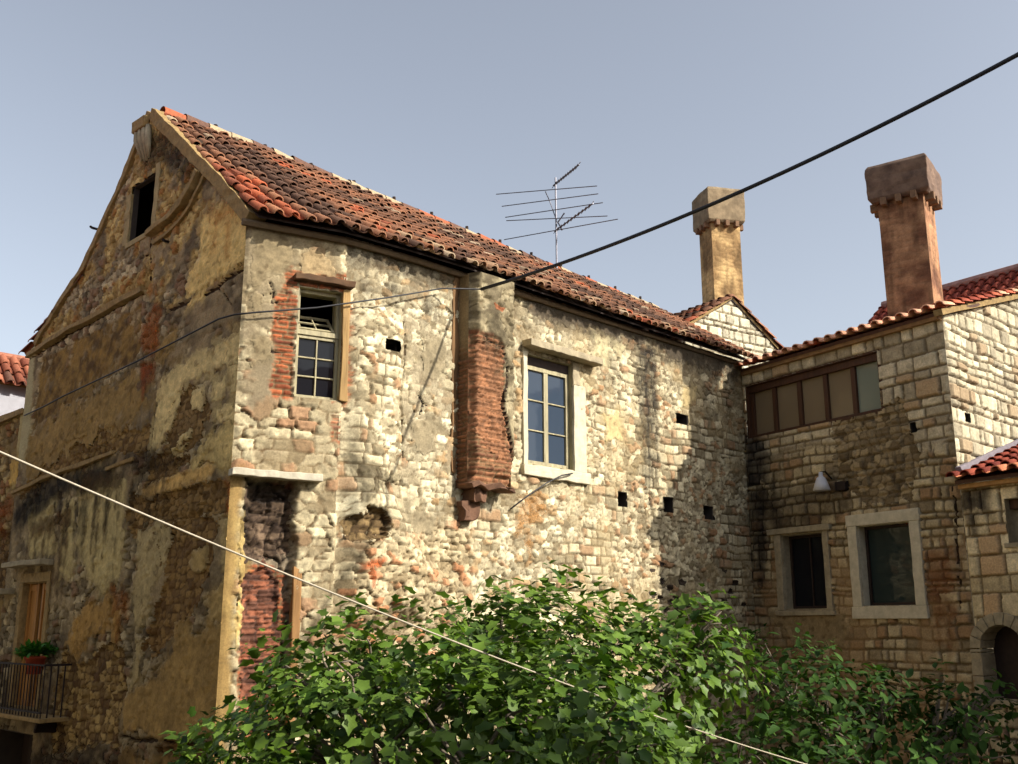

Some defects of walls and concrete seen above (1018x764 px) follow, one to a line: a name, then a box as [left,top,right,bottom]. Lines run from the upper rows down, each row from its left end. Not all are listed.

peeling [185,205,335,317]
peeling [420,334,447,381]
peeling [410,414,439,459]
flaking render [0,530,11,598]
water stain [14,451,158,560]
peeling [8,327,292,764]
spalling [339,504,394,543]